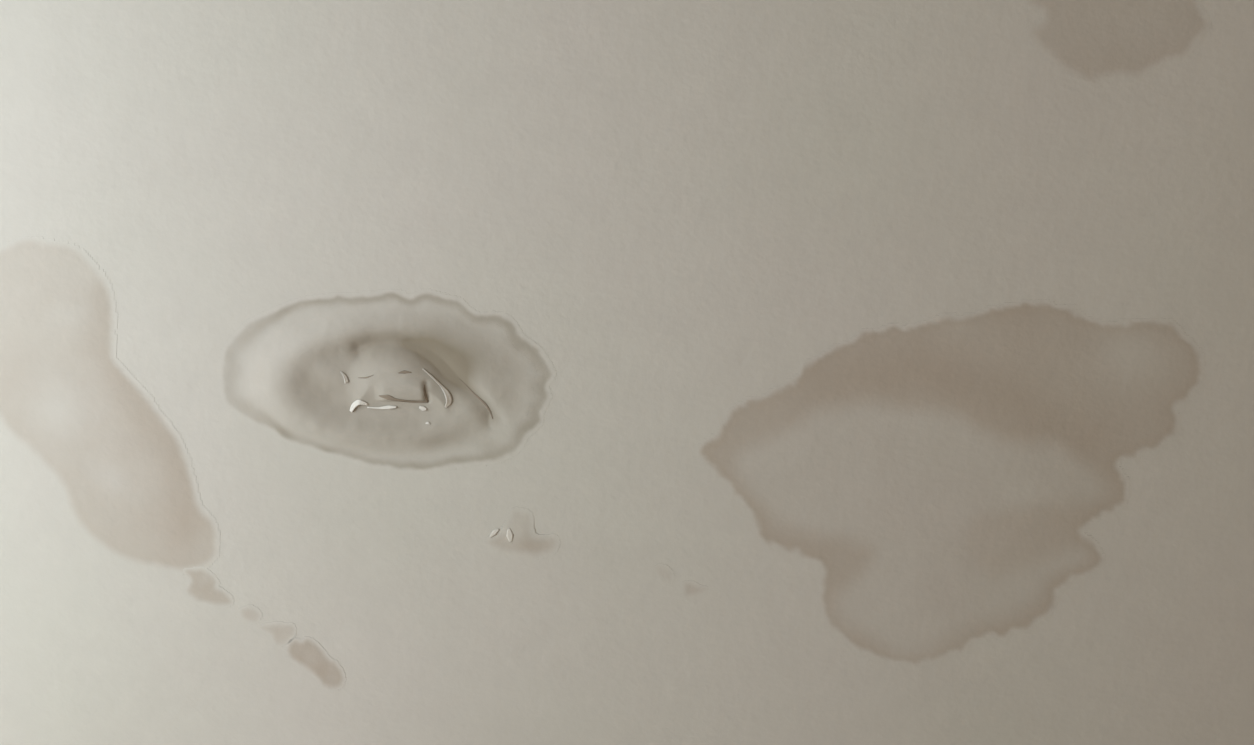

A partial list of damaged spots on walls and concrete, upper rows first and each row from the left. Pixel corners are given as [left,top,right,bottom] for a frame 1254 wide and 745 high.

water stain [1023,0,1211,87]
water stain [0,236,346,690]
water stain [698,300,1205,667]